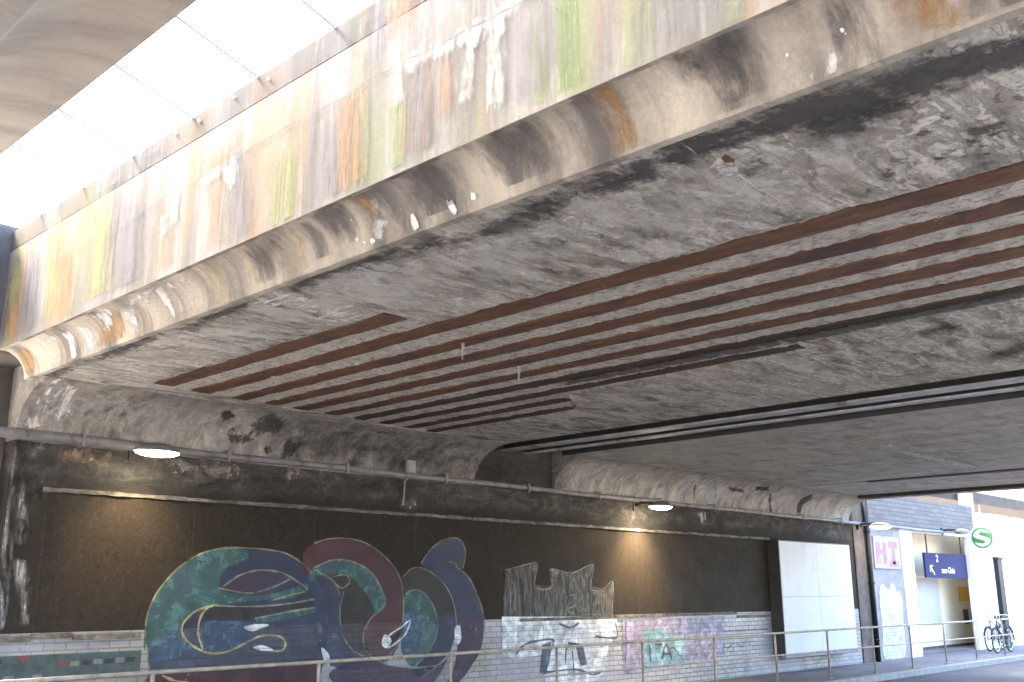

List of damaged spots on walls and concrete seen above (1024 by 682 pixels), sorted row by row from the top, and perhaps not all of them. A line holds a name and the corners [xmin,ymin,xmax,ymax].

rust [6,299,18,340]
rust [101,312,125,344]
water stain [25,5,1024,429]
spalling [152,110,1024,481]
water stain [0,452,69,624]